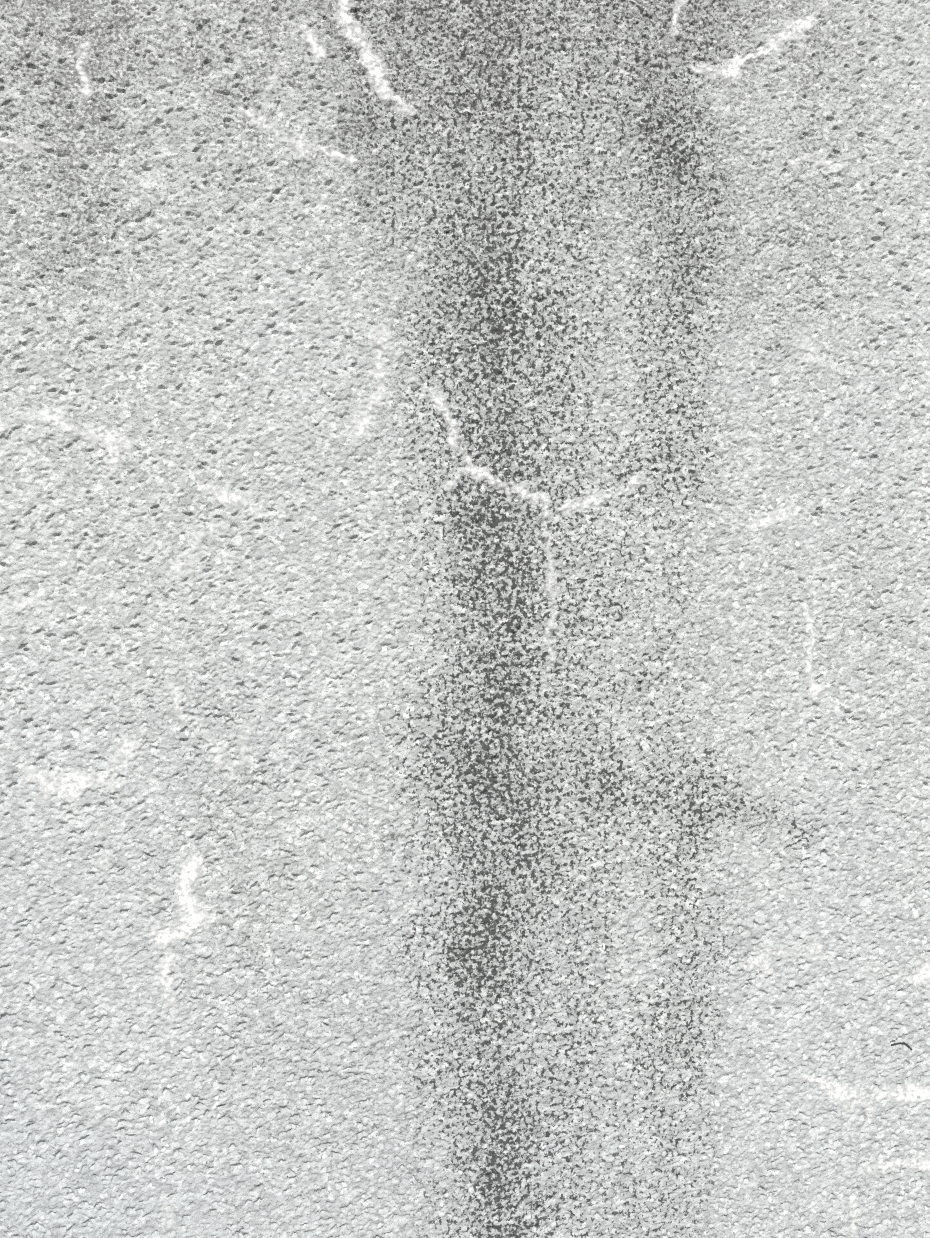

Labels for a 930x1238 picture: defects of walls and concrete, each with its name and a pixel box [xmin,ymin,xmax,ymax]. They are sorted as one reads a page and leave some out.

crack [672,0,688,35]
crack [692,4,830,80]
crack [350,321,650,672]
damp [328,0,813,1238]